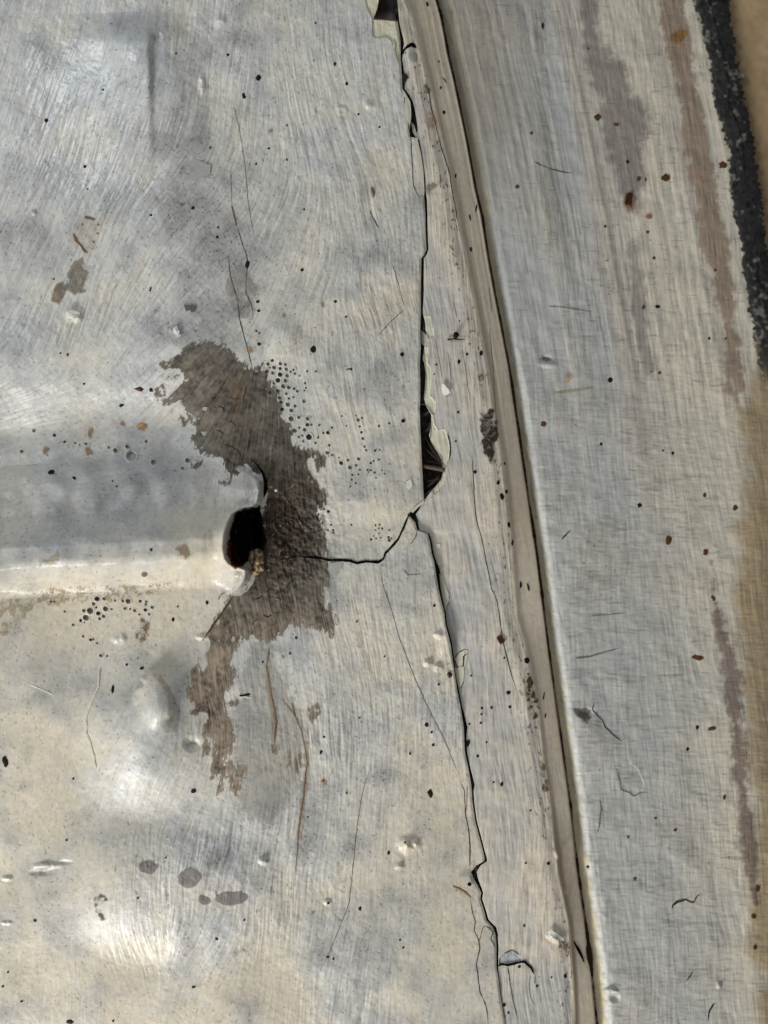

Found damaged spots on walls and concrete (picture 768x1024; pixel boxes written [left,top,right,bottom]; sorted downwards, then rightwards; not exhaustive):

damp [152,339,338,796]
crack [280,0,602,1024]